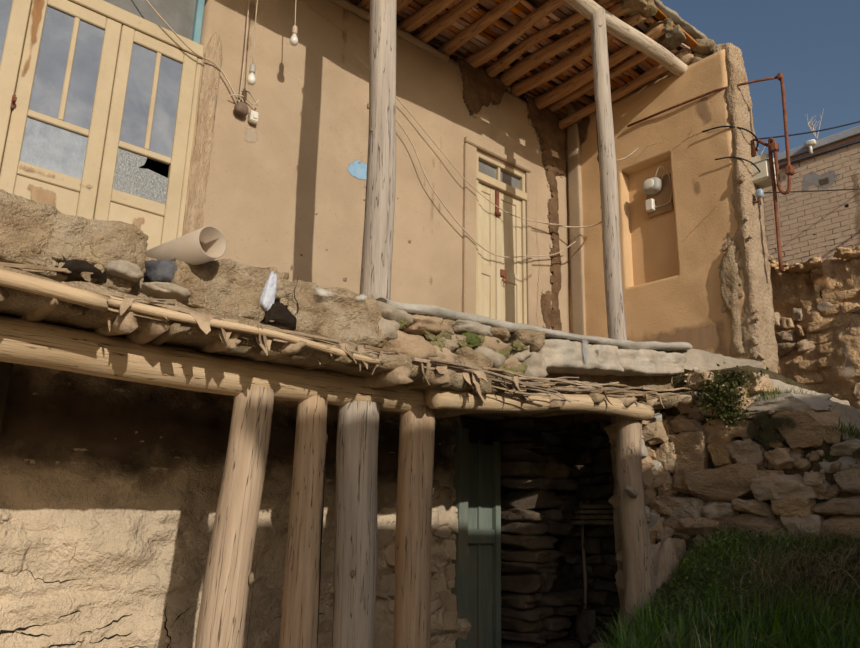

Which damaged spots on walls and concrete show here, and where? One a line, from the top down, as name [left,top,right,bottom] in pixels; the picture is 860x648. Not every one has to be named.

rust [31,0,44,43]
flaking render [456,56,511,118]
flaking render [524,95,567,331]
flaking render [718,240,745,358]
crack [28,546,77,583]
crack [0,603,190,648]